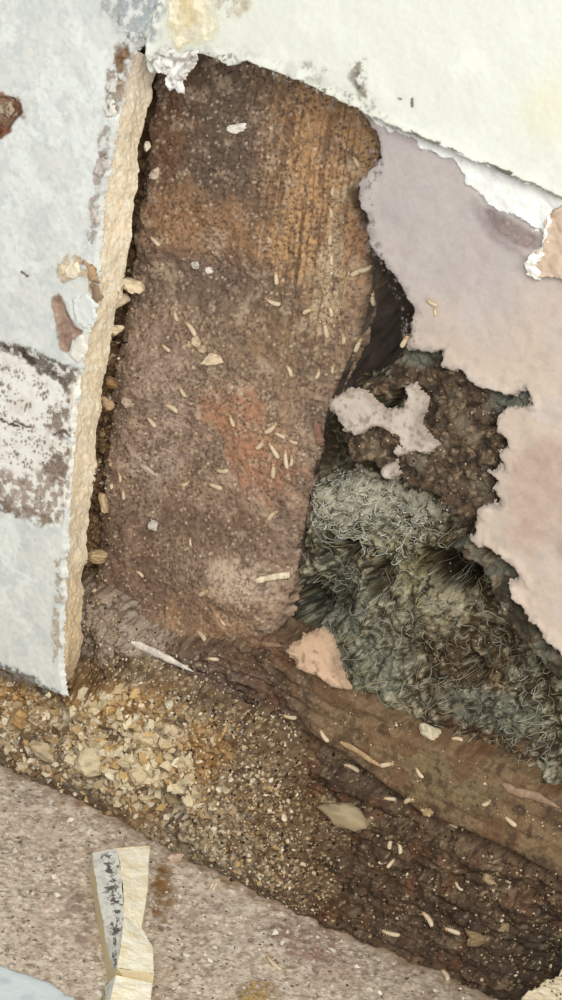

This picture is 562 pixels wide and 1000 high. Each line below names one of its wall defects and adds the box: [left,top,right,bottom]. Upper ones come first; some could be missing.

spalling [0,92,21,139]
spalling [87,42,135,244]
spalling [226,123,247,134]
peeling [51,255,104,363]
mould [0,342,78,527]